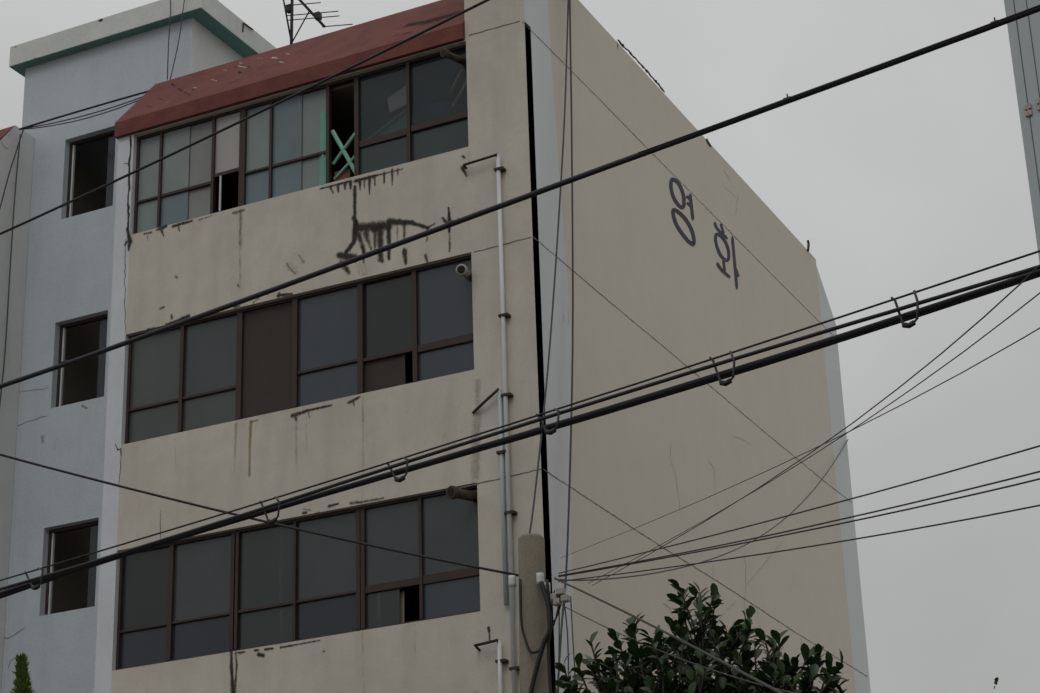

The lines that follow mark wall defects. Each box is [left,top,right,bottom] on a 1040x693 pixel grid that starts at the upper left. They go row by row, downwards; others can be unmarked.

leakage [320,168,451,274]